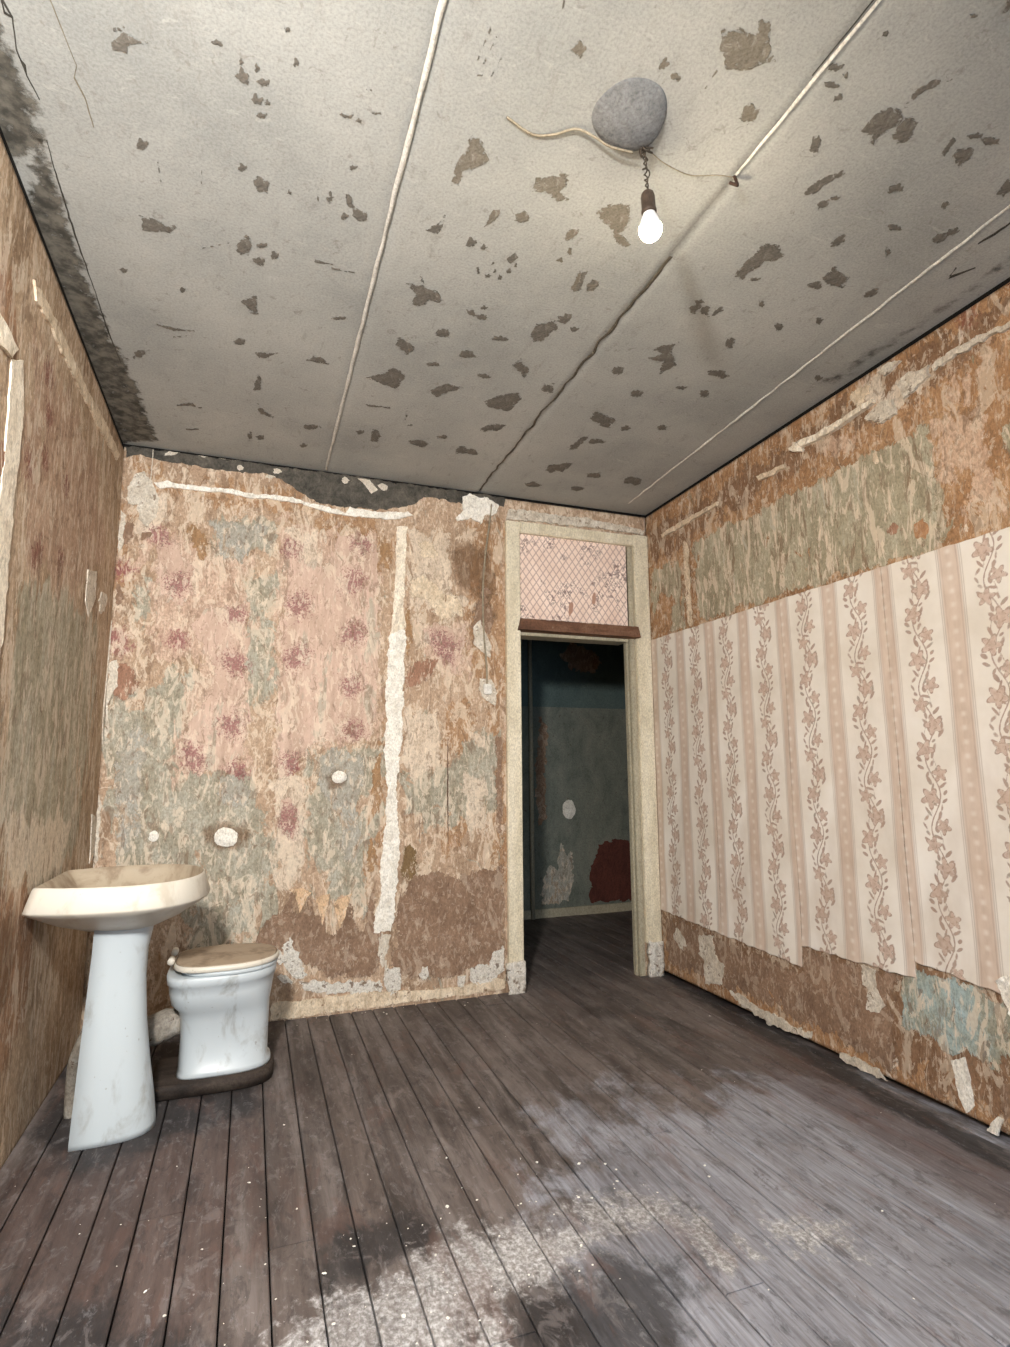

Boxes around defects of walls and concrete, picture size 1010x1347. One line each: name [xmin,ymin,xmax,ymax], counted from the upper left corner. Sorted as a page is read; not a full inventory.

crack [0,0,40,100]
crack [50,0,94,127]
peeling [705,19,776,89]
peeling [861,79,952,145]
peeling [804,170,845,211]
crack [46,140,121,363]
peeling [734,243,784,281]
spalling [756,321,1010,481]
flaking render [0,24,645,1021]
flaking render [665,919,902,1081]
spalling [951,1057,975,1113]
spalling [987,1116,1004,1136]